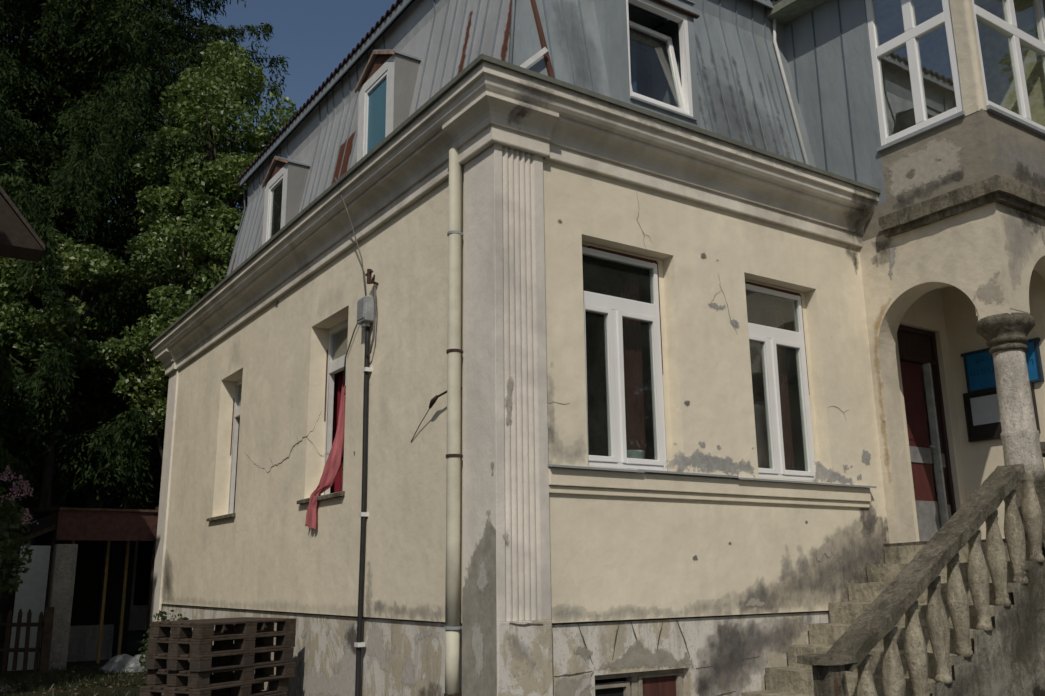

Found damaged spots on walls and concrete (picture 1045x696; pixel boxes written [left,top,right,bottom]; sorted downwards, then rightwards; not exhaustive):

leakage [516,85,540,118]
spalling [505,377,513,424]
crack [241,411,322,473]
peeling [665,442,754,475]
leakage [739,506,890,607]
peeling [462,512,509,696]
peeling [298,622,362,696]
leakage [698,623,794,696]